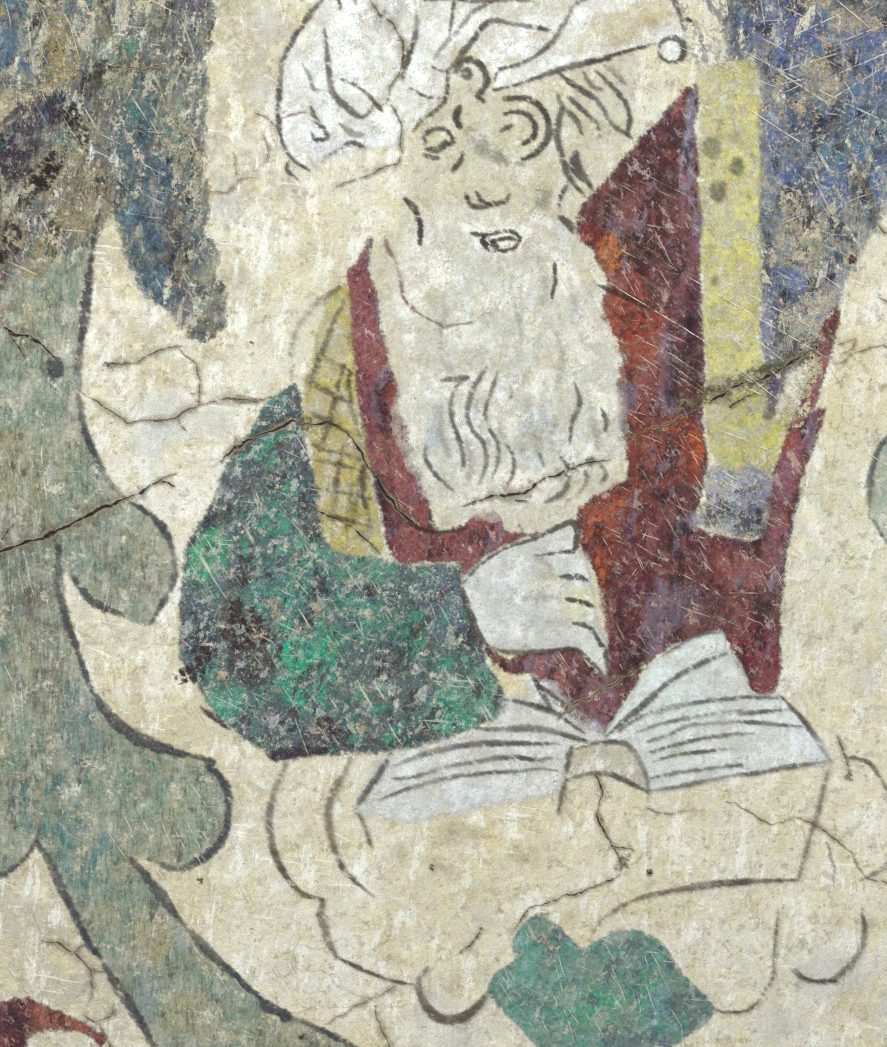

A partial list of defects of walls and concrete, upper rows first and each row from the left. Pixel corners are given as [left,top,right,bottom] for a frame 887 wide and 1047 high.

crack [848,147,887,234]
crack [78,346,415,525]
crack [439,338,887,533]
crack [0,474,176,558]
crack [317,511,380,554]
crack [512,775,633,933]
crack [726,801,887,883]